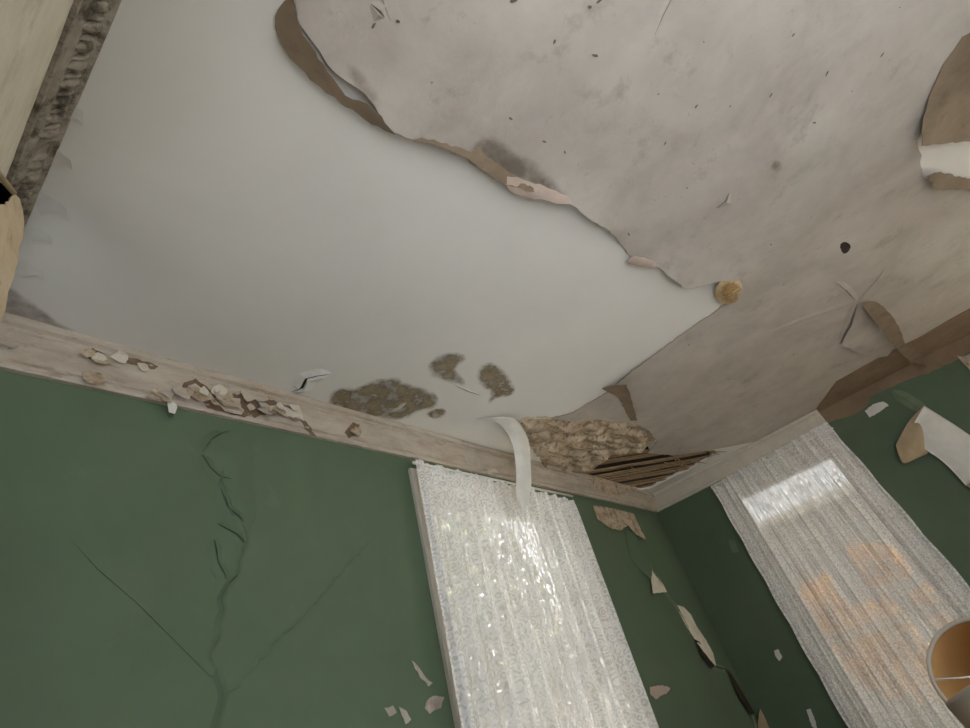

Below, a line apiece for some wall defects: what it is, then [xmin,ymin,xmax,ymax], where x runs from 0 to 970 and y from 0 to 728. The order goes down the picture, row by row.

peeling [80,348,158,371]
peeling [146,378,316,436]
damp [331,380,445,418]
damp [432,354,514,399]
spalling [816,309,970,423]
peeling [345,422,362,439]
spalling [478,416,769,728]
peeling [412,661,444,714]
peeling [384,705,411,724]